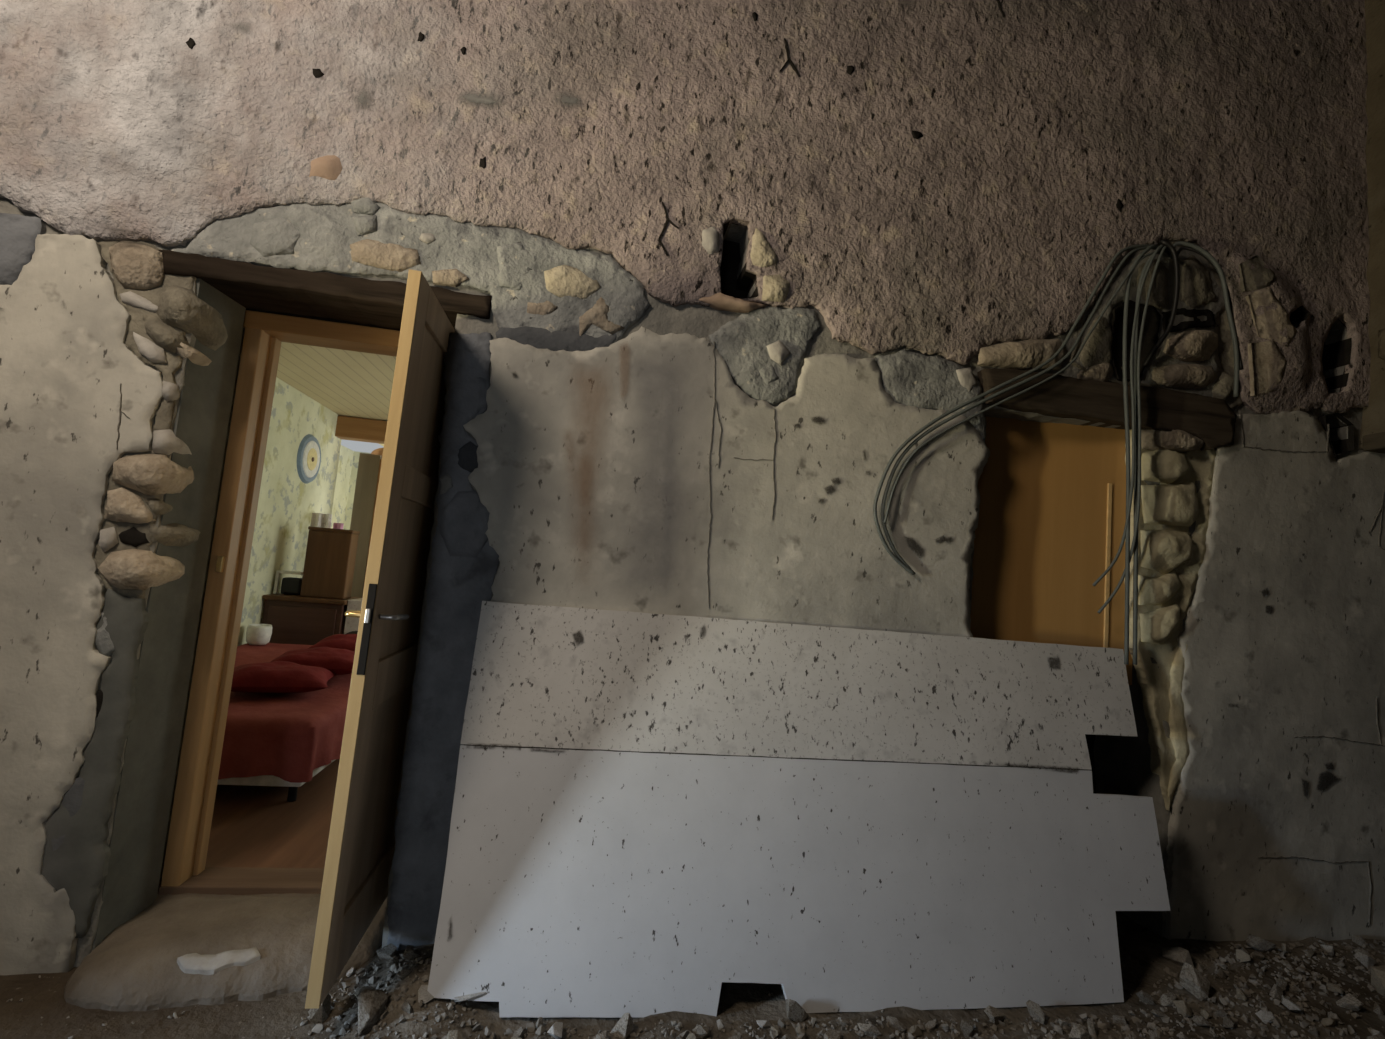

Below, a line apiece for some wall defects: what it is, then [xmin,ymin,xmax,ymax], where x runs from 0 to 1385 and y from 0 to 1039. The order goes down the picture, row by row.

spalling [699,221,790,313]
spalling [1069,241,1243,410]
flaking render [171,197,651,951]